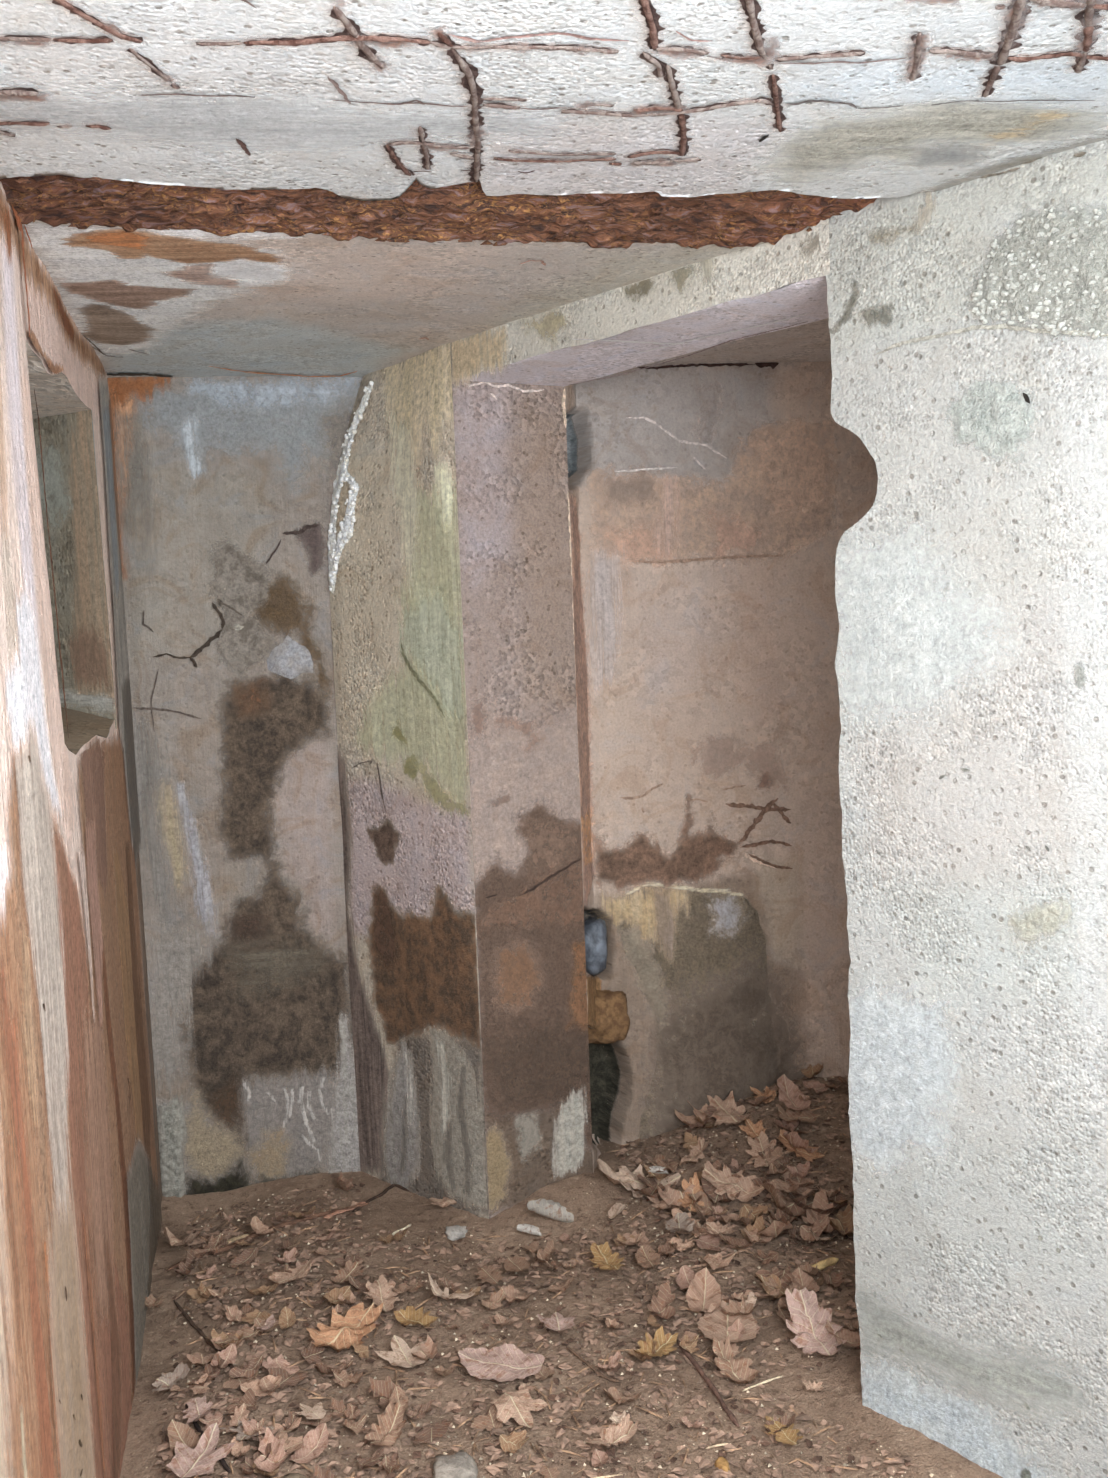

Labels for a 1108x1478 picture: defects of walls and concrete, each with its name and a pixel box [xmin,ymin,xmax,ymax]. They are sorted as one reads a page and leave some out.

spalling [0,87,48,102]
spalling [0,121,111,137]
spalling [0,0,180,89]
spalling [196,0,866,183]
spalling [906,0,1108,97]
rust [0,189,171,573]
crack [265,524,319,565]
crack [136,602,225,732]
crack [621,784,793,869]
damp [0,376,743,1478]
rust [0,731,159,1478]